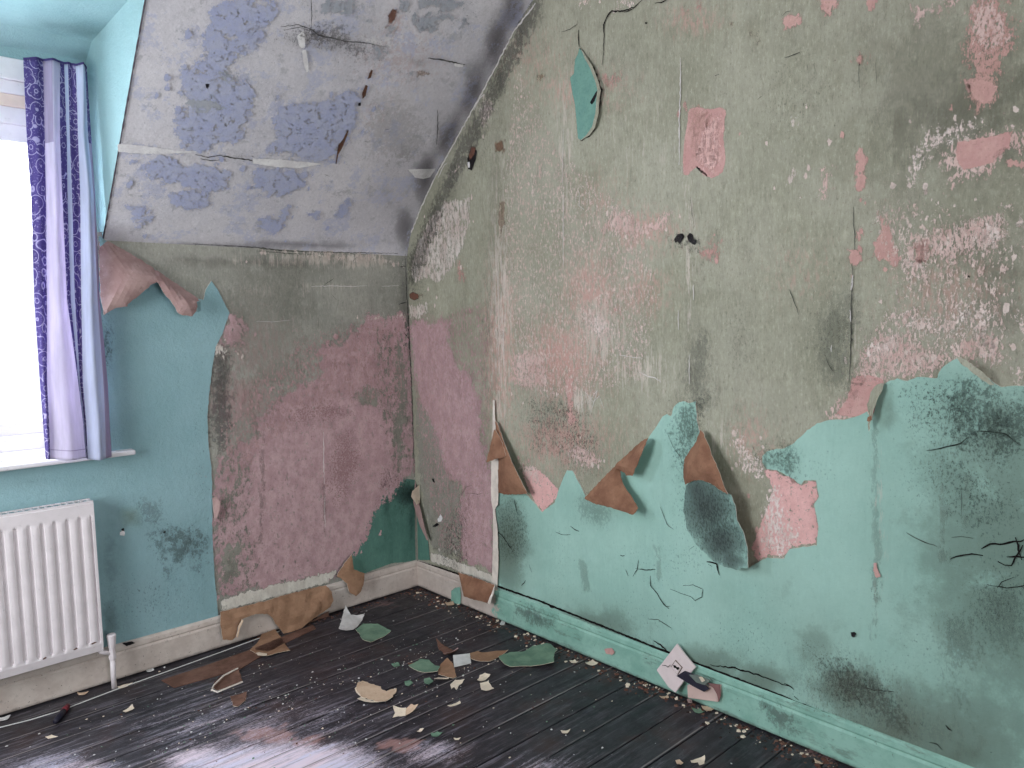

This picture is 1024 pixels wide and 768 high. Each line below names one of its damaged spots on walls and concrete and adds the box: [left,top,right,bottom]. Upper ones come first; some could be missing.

peeling [117,0,493,611]
crack [195,3,536,477]
peeling [502,66,726,469]
peeling [825,0,1024,420]
peeling [517,456,558,511]
mould [683,480,748,570]
peeling [729,429,818,561]
crack [907,492,1024,588]
crack [497,546,829,714]